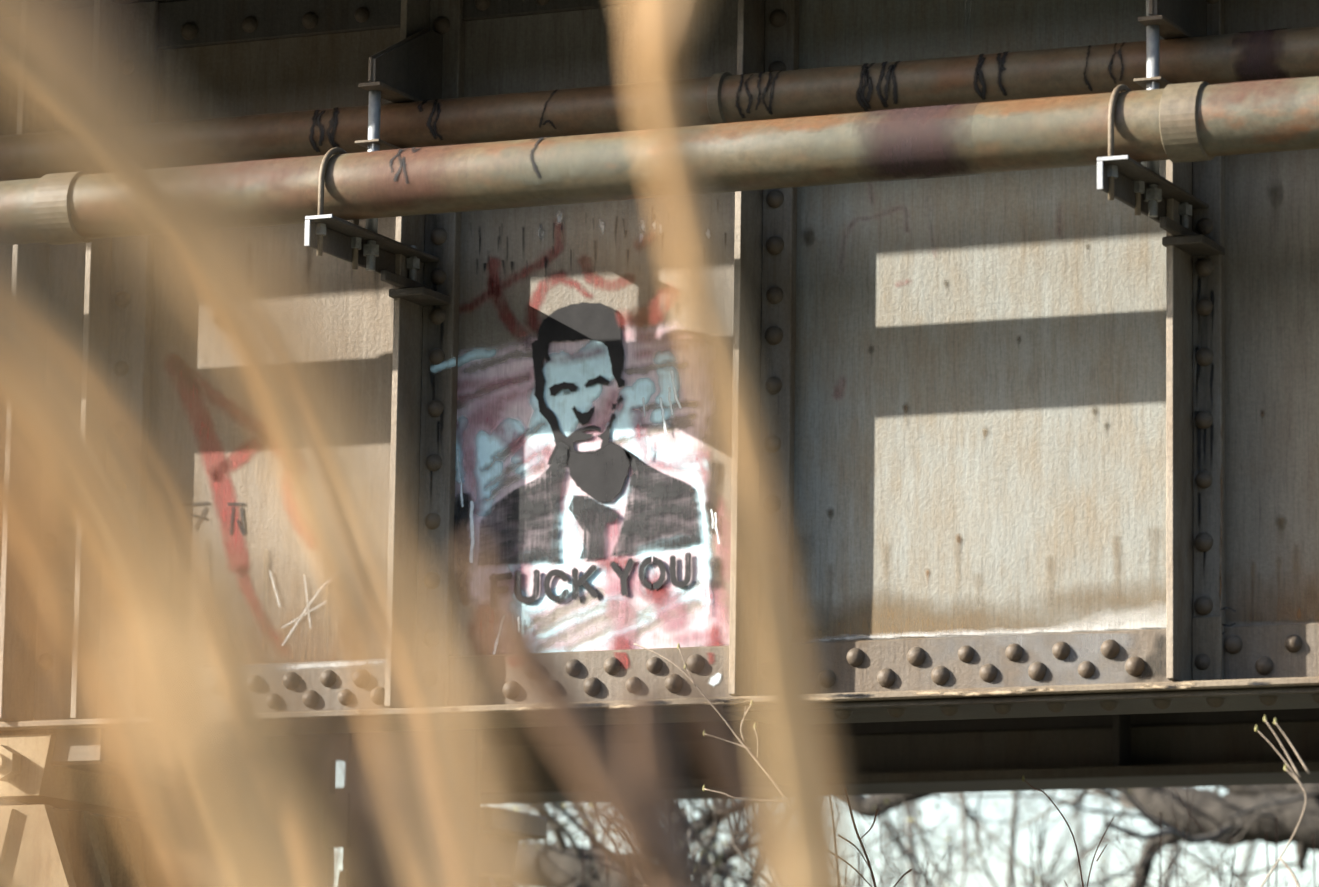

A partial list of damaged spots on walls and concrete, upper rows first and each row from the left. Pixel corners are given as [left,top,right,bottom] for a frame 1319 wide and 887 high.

corrosion [1232,28,1287,101]
corrosion [746,115,832,130]
corrosion [870,104,966,179]
corrosion [1004,96,1077,108]
corrosion [805,601,1019,642]